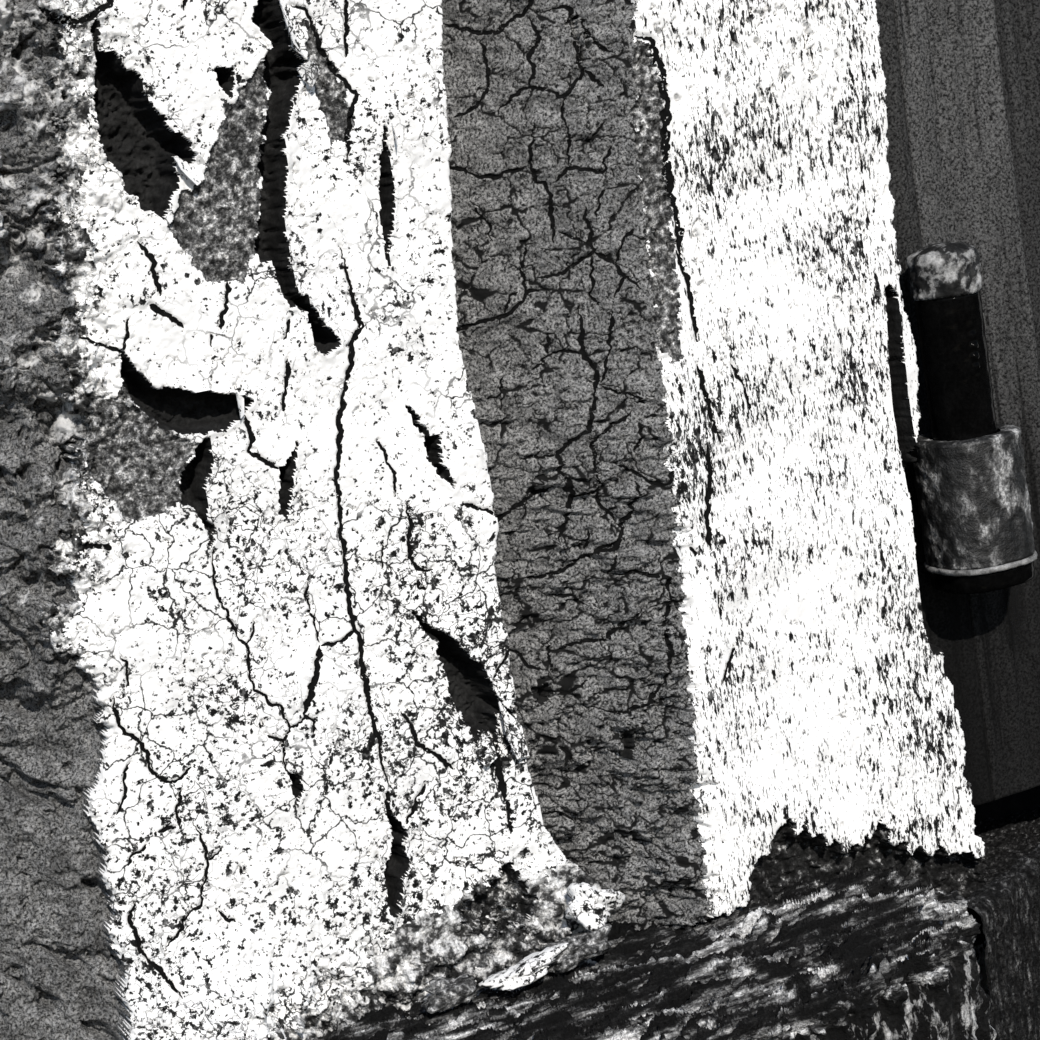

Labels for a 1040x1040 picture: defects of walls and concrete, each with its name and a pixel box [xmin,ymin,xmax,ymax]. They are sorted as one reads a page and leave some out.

crack [291,0,359,166]
peeling [35,0,356,355]
spalling [378,121,398,268]
crack [79,241,184,353]
crack [443,0,722,715]
peeling [37,313,254,669]
crack [210,247,391,788]
crack [376,439,433,590]
spalling [412,611,529,768]
crack [112,656,236,999]
spalling [383,791,411,918]
spalling [692,817,989,927]